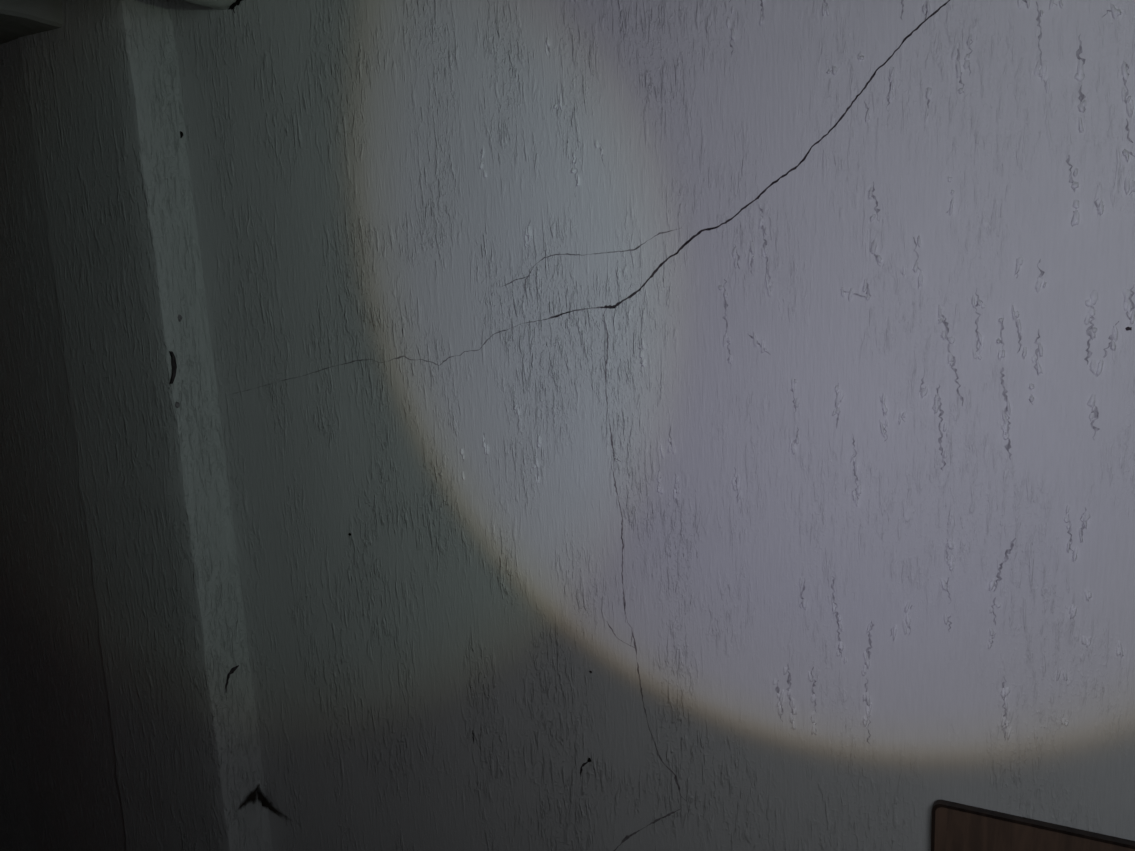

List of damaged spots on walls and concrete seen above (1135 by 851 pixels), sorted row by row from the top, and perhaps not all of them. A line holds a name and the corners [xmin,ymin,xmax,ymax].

crack [229,0,950,851]